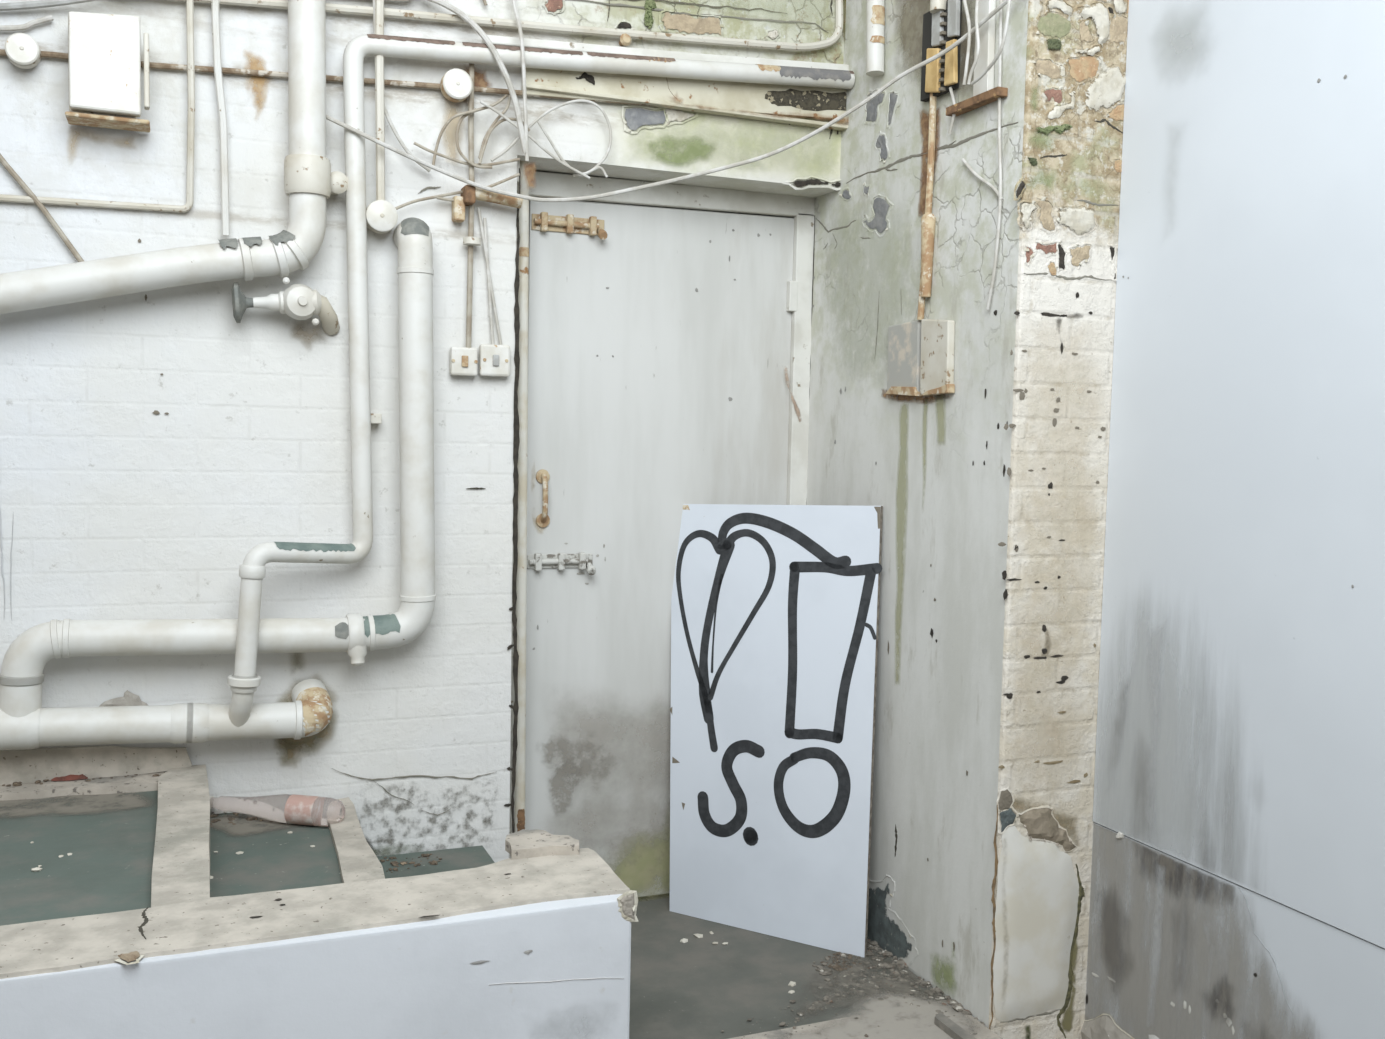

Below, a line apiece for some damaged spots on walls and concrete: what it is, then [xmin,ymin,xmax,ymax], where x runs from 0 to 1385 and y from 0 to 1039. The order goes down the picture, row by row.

rust [249,56,265,104]
spalling [542,0,565,15]
spalling [659,8,724,38]
spalling [1032,0,1129,106]
rust [919,109,939,215]
spalling [1013,176,1092,280]
crack [332,168,521,833]
rust [280,687,333,763]
damp [366,789,491,856]
flaking render [996,788,1077,853]
damp [1144,848,1232,893]
crack [138,907,149,939]